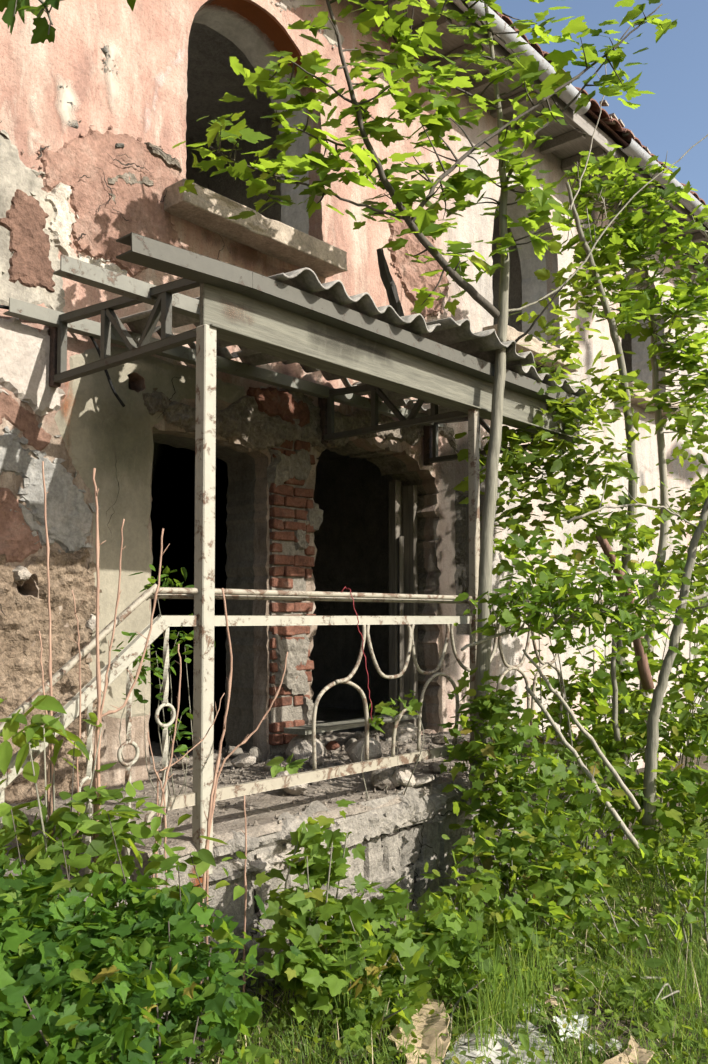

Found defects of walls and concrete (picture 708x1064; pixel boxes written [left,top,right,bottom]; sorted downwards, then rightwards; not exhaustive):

spalling [57,85,81,129]
spalling [0,130,127,756]
spalling [142,388,196,433]
spalling [216,386,424,455]
spalling [438,423,458,453]
spalling [4,698,103,804]